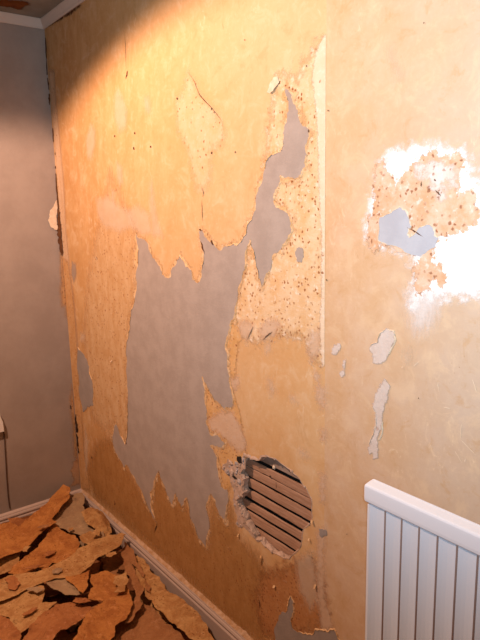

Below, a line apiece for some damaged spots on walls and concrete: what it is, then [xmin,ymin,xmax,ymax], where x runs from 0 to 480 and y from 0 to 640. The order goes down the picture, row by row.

peeling [48,200,58,230]
flaking render [364,143,480,326]
peeling [110,77,313,559]
peeling [369,329,396,364]
peeling [368,379,390,459]